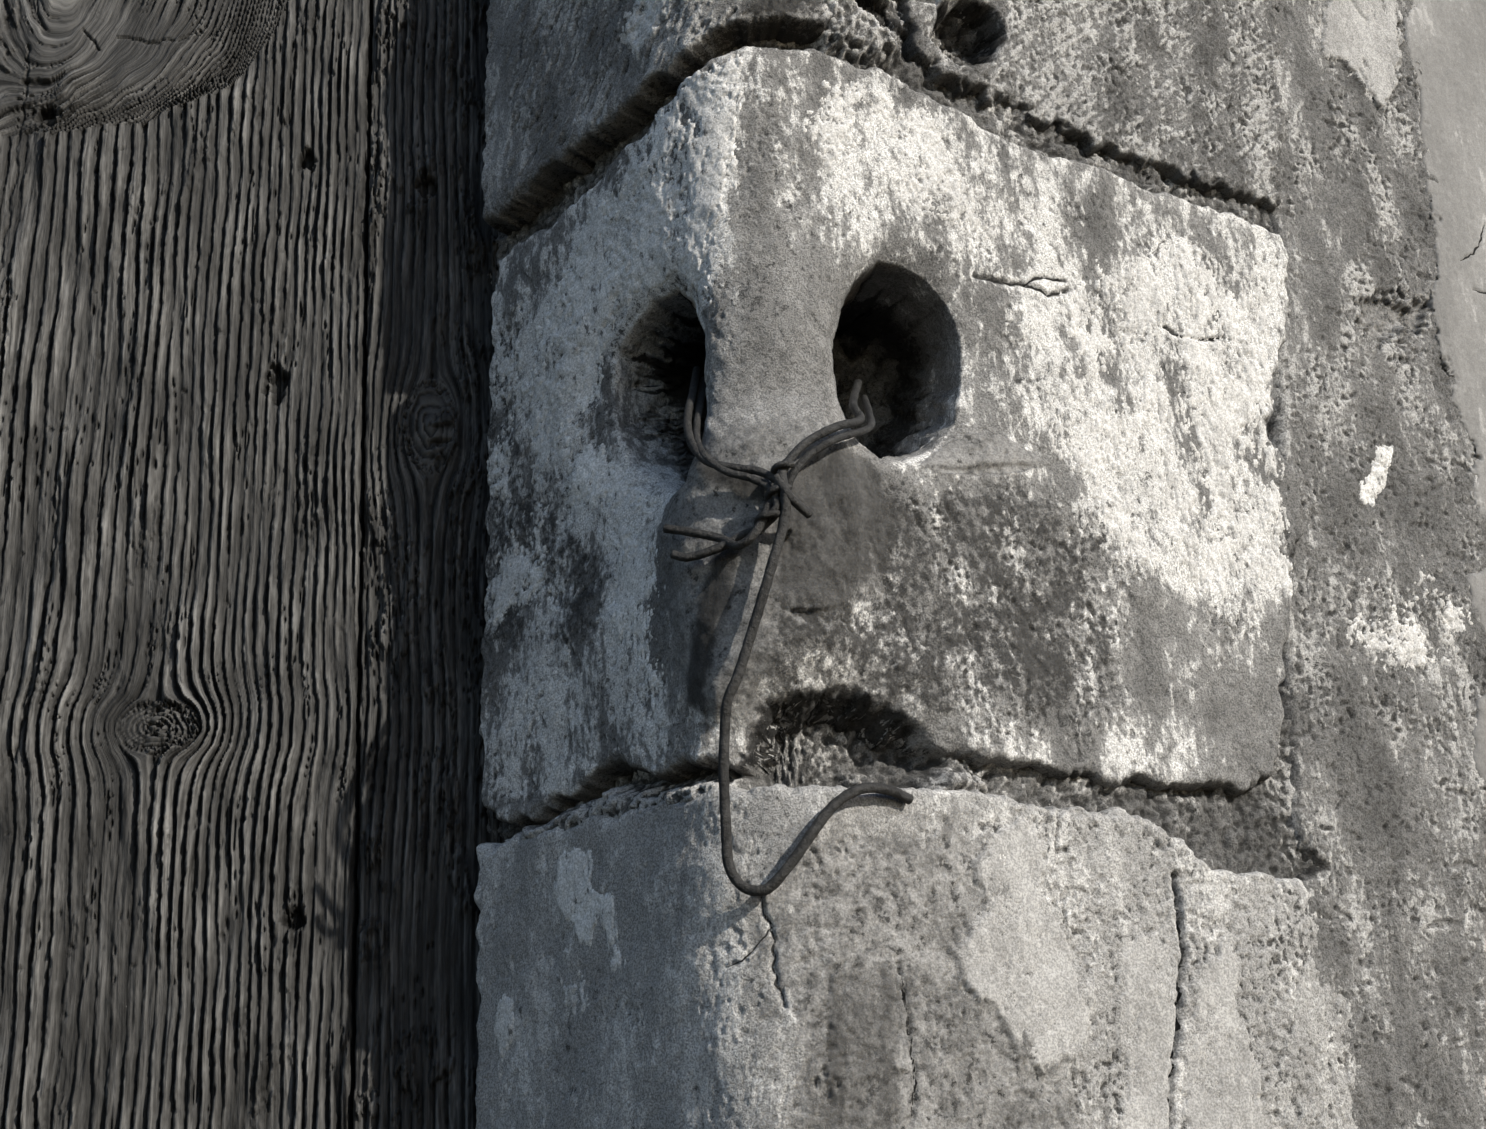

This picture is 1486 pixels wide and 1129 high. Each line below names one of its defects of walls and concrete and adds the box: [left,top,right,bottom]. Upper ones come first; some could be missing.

crack [974,277,1066,297]
crack [727,897,784,1001]
crack [1167,898,1183,1120]